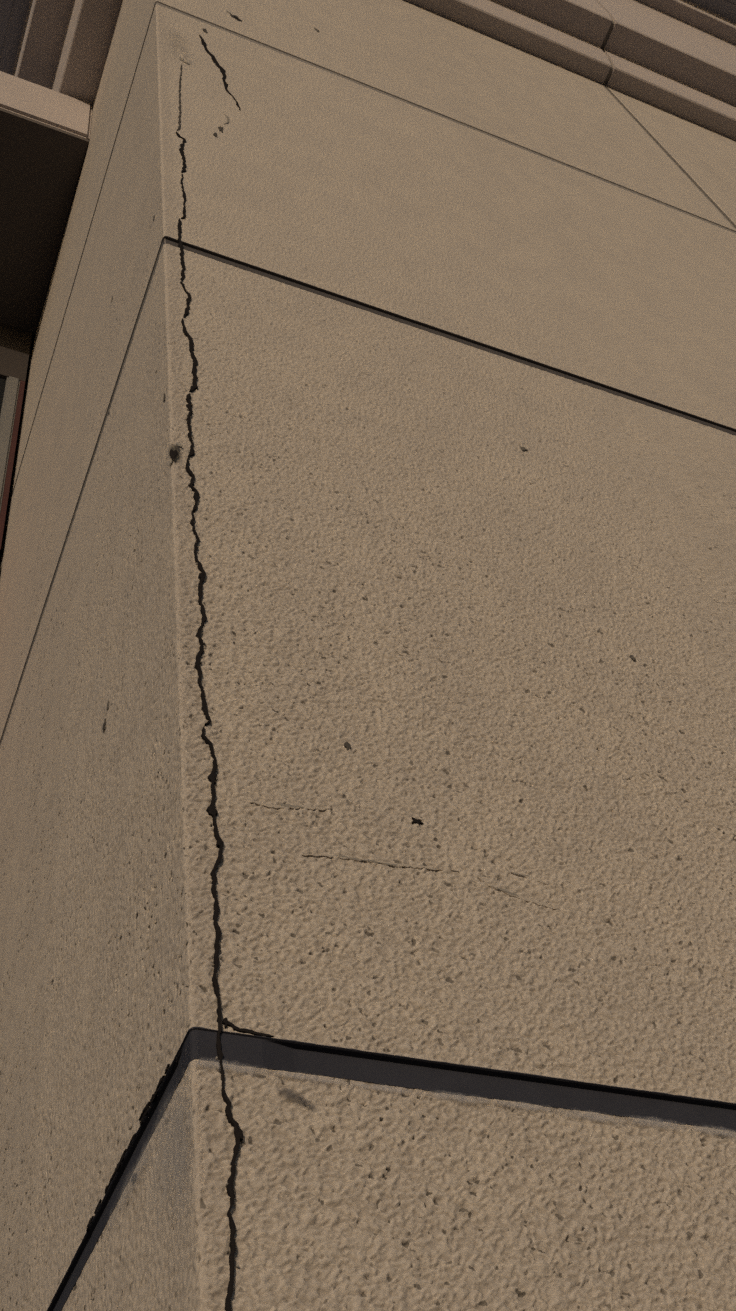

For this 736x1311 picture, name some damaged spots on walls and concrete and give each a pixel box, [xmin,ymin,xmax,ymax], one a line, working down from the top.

crack [176,28,243,1311]